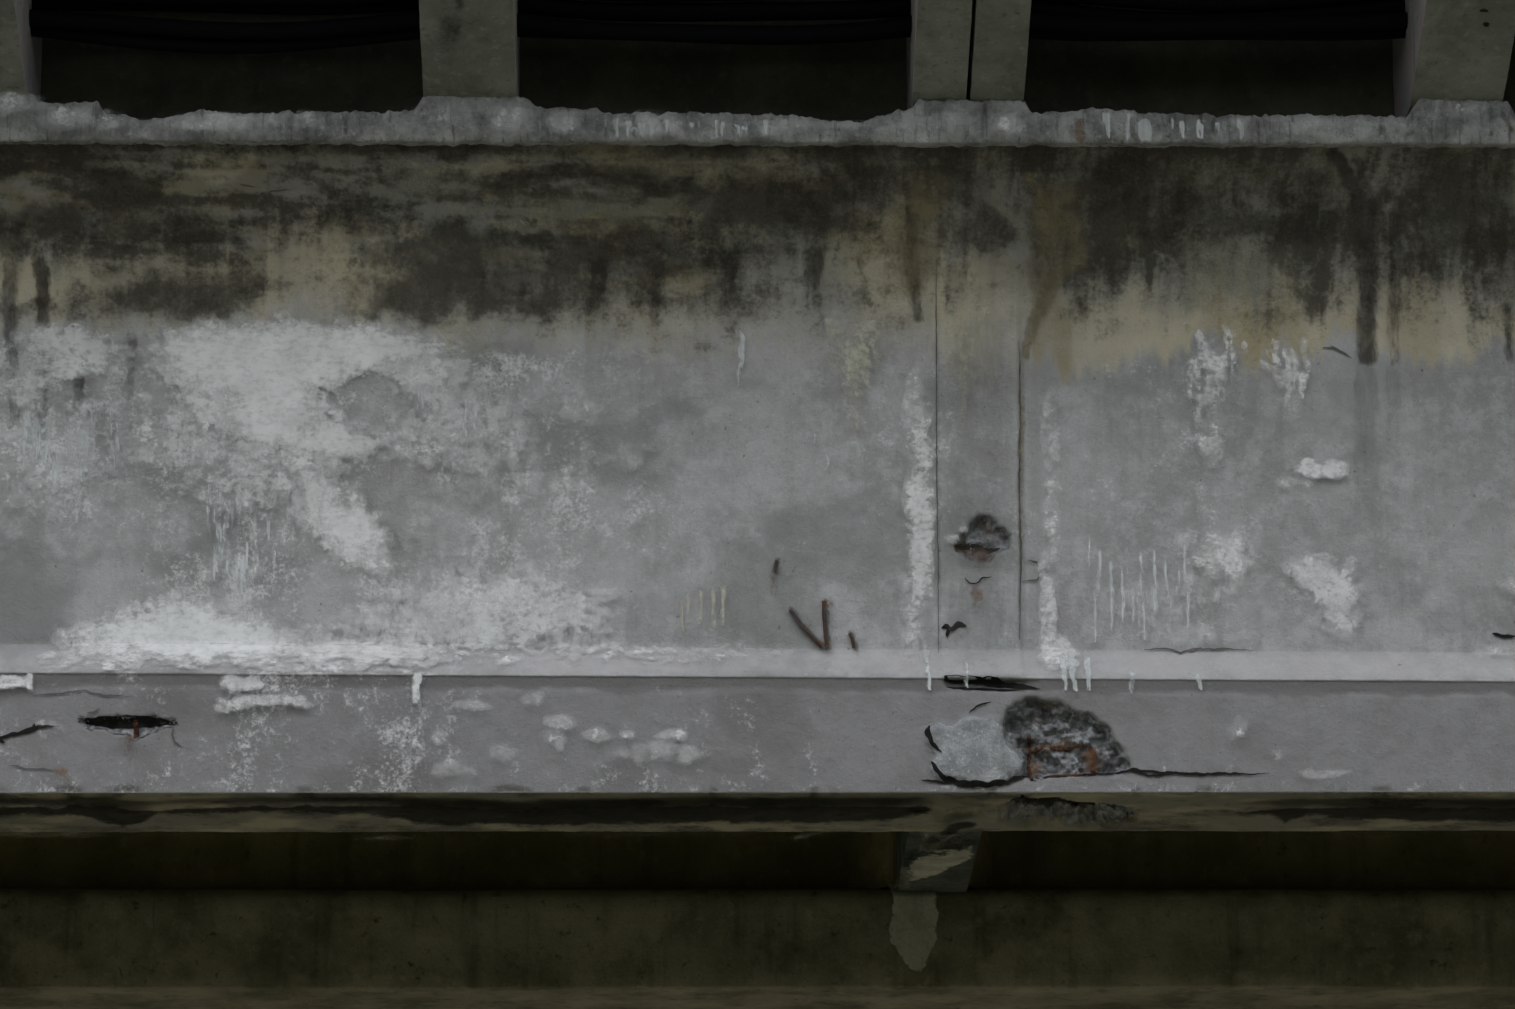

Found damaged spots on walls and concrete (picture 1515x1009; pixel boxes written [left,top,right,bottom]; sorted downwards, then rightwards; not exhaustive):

leakage [0,141,264,328]
leakage [317,144,1515,363]
peeling [903,377,1011,690]
spalling [999,533,1253,826]
crack [0,689,129,770]
crack [161,722,182,747]
crack [1083,767,1269,777]
leakage [0,802,990,886]
leakage [1236,807,1515,823]